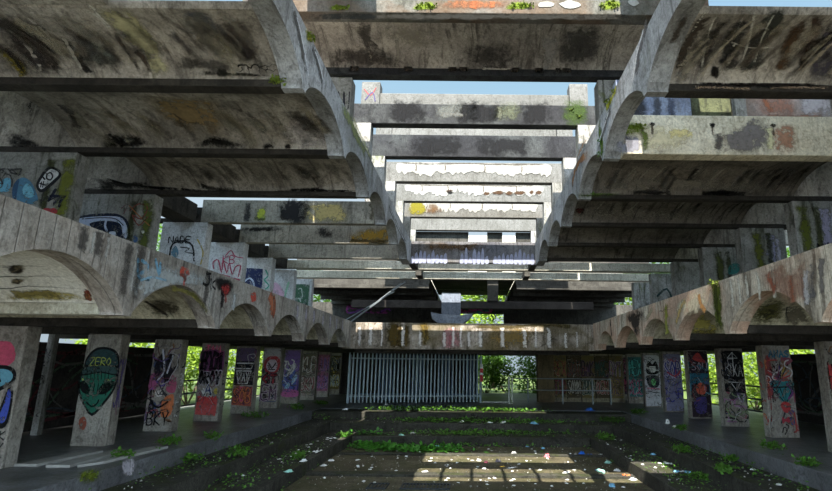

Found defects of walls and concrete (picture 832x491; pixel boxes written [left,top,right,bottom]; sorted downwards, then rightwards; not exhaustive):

damp [0,5,166,75]
damp [175,12,255,72]
damp [313,13,622,70]
damp [670,10,832,80]
damp [391,101,425,122]
damp [438,101,502,123]
damp [522,102,548,123]
damp [104,134,145,147]
peeling [396,162,552,213]
rust [474,185,542,209]
efflorescence [358,327,383,346]
damp [443,323,578,348]